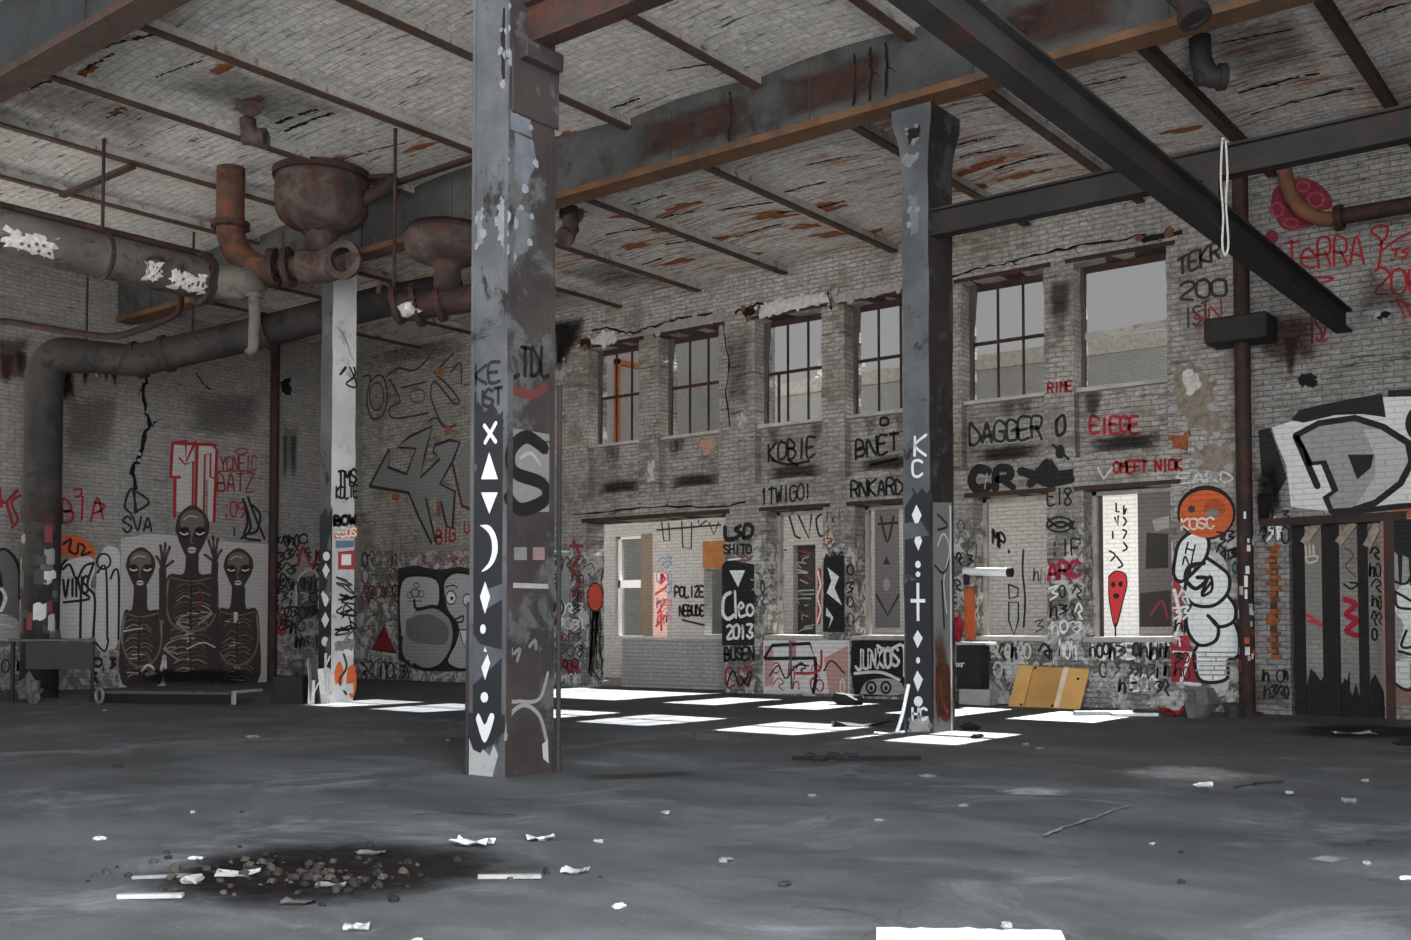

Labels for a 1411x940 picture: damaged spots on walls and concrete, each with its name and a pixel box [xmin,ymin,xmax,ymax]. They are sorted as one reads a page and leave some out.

corrosion [1015,0,1106,41]
corrosion [792,56,874,113]
corrosion [646,101,741,154]
peeling [474,109,538,263]
corrosion [619,229,664,251]
corrosion [664,200,704,212]
corrosion [753,202,849,238]
corrosion [952,157,1053,193]
corrosion [661,258,697,266]
crack [129,374,163,490]